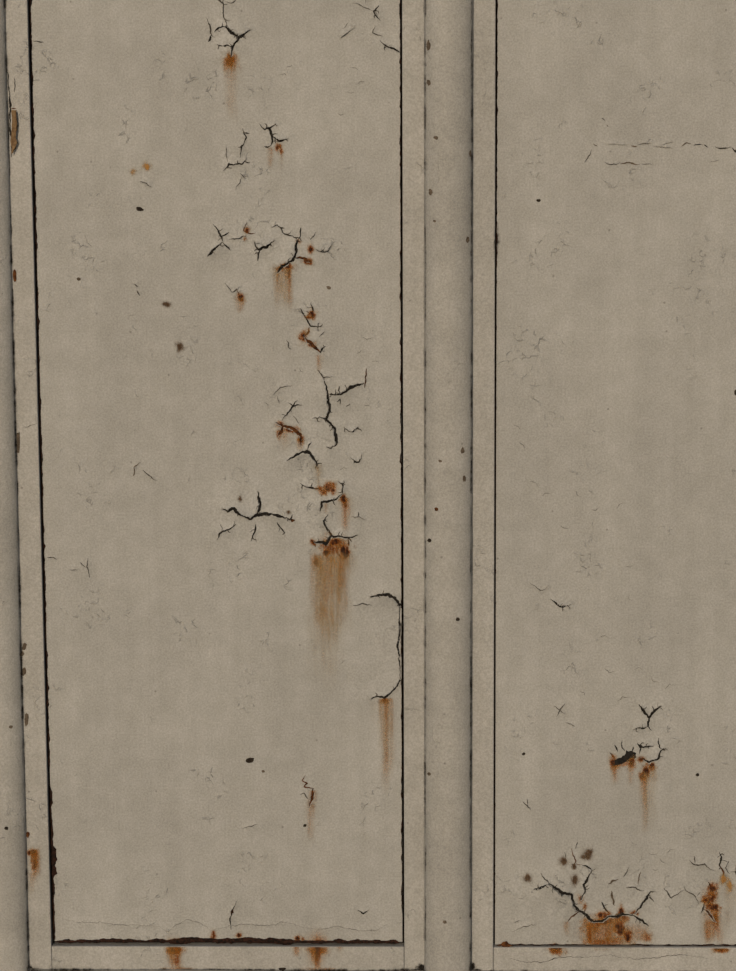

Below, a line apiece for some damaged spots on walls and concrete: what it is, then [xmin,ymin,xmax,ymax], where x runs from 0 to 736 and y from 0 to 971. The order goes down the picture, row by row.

corrosion [30,0,50,768]
crack [260,368,314,452]
corrosion [310,538,350,591]
peeling [341,580,402,709]
crack [291,767,325,815]
corrosion [610,755,655,784]
corrosion [27,849,38,873]
corrosion [50,787,401,969]
corrosion [494,777,736,954]